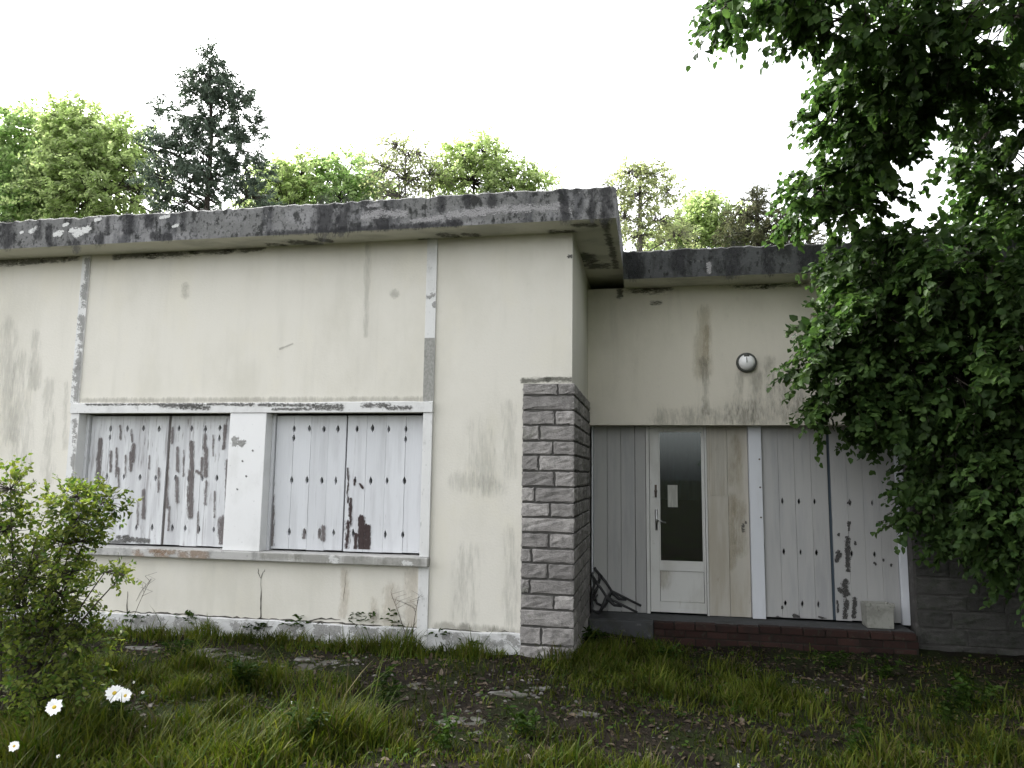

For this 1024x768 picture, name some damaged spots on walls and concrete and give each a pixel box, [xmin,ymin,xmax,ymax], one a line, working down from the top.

damp [0,219,80,266]
damp [94,216,110,246]
damp [112,183,671,298]
damp [706,241,814,289]
peeling [71,258,90,403]
peeling [96,424,254,545]
peeling [818,521,858,619]